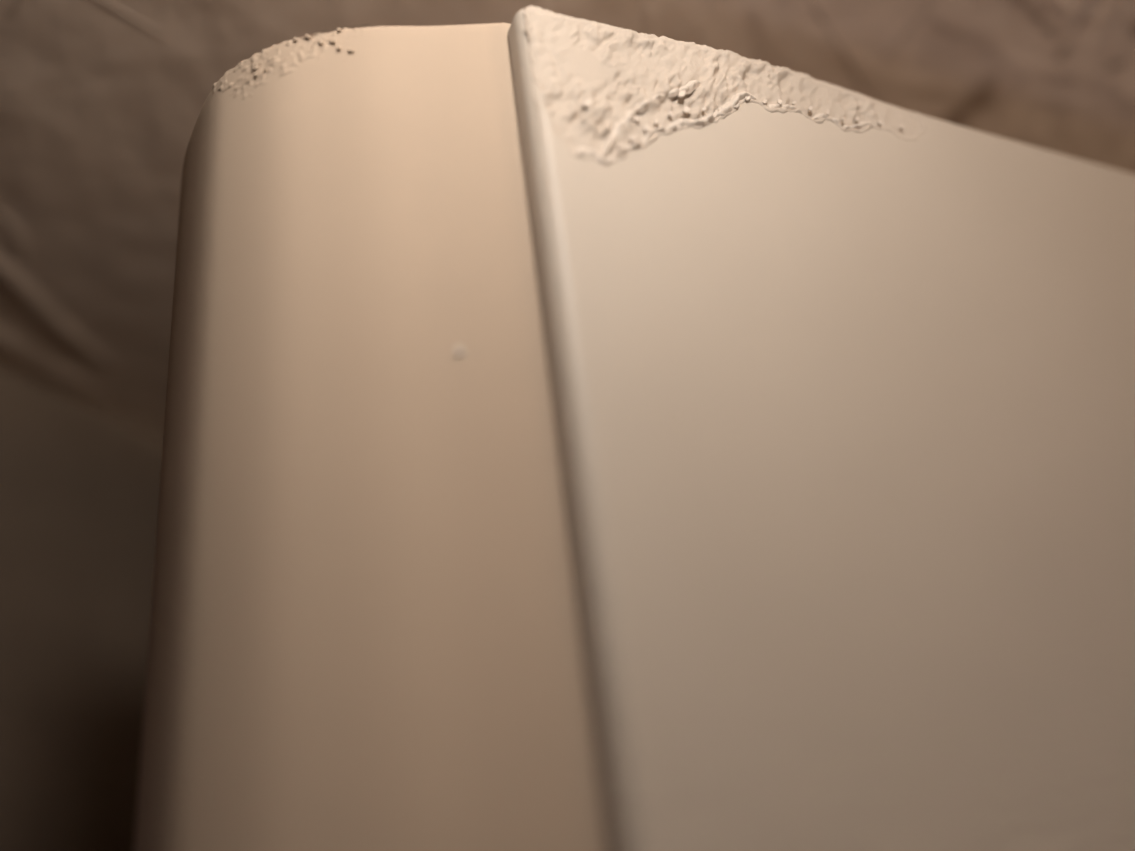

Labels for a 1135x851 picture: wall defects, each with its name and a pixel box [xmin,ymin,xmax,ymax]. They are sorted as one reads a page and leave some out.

peeling [213,26,381,102]
peeling [524,6,927,166]